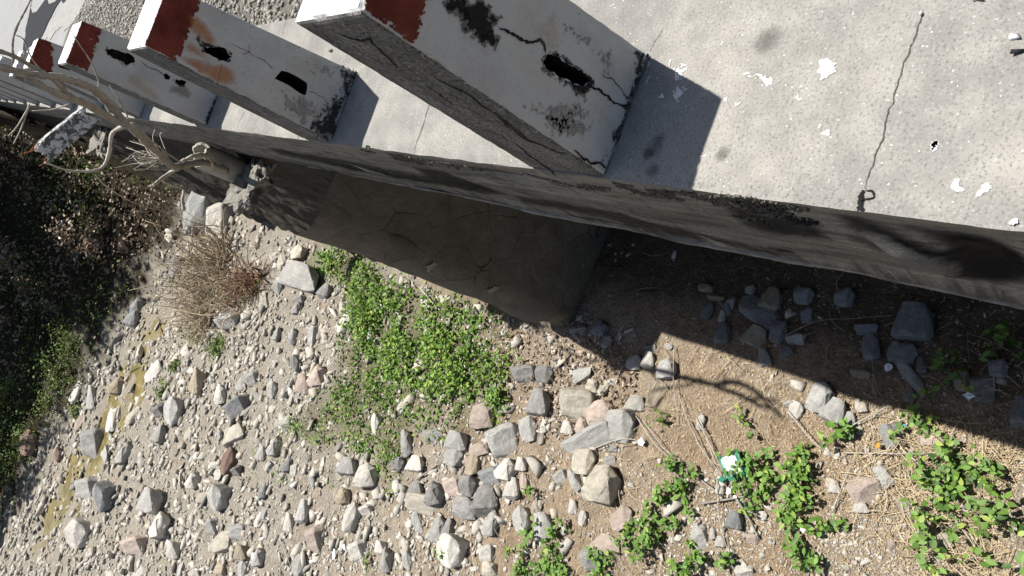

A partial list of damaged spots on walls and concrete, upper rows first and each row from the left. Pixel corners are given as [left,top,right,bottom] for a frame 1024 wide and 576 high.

crack [499,28,546,52]
corrosion [189,47,232,81]
peeling [524,24,613,140]
crack [592,73,630,107]
crack [856,10,923,212]
damp [519,198,780,256]
damp [731,208,826,239]
damp [845,217,932,254]